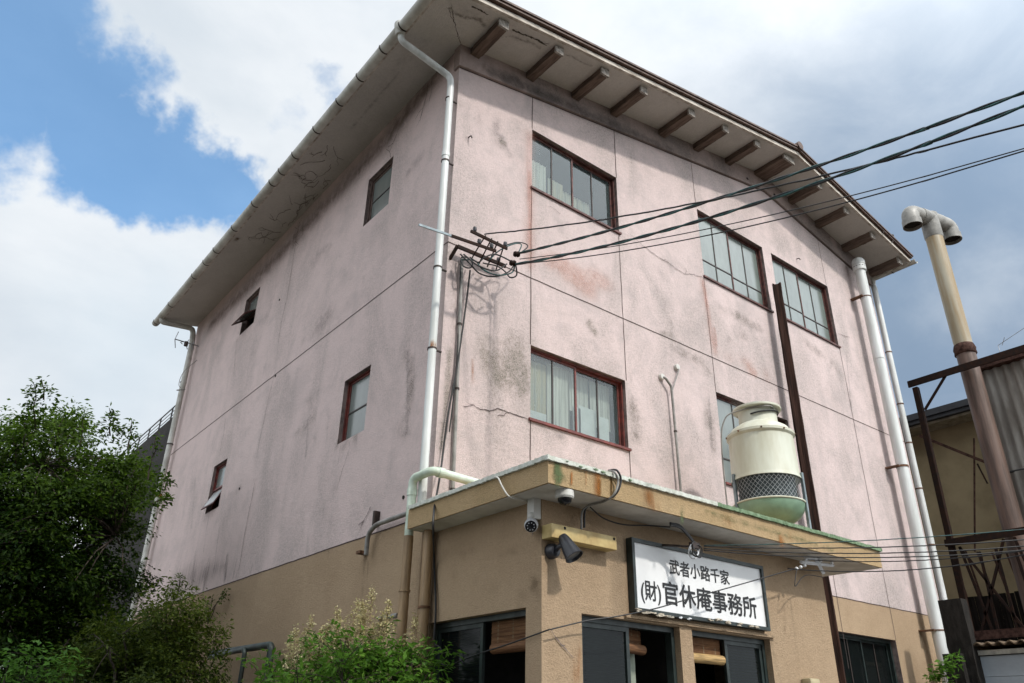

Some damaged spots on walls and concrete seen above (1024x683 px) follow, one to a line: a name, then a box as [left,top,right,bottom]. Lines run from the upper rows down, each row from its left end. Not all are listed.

crack [464,402,527,419]